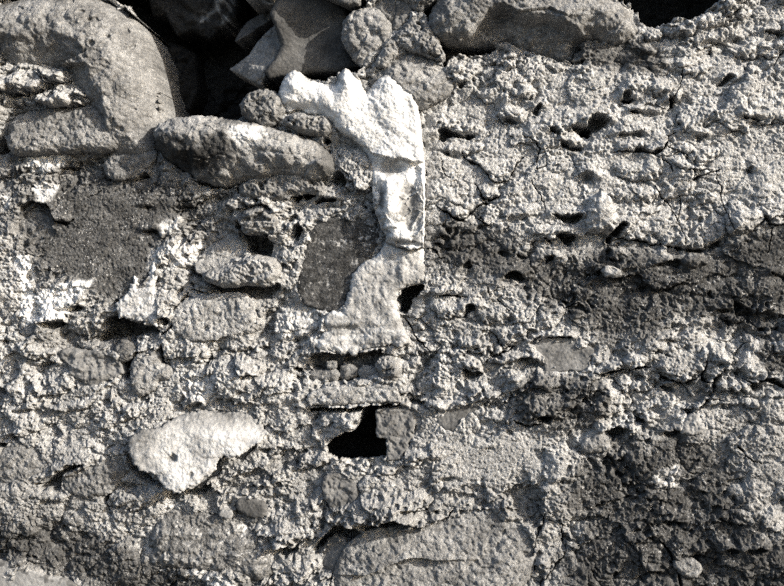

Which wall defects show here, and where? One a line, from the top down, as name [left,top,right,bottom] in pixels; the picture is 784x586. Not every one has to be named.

spalling [618,0,719,29]
spalling [116,0,259,120]
spalling [442,49,485,67]
crack [436,136,547,229]
crack [618,69,784,254]
crack [485,328,516,363]
crack [593,343,784,412]
spalling [309,403,400,459]